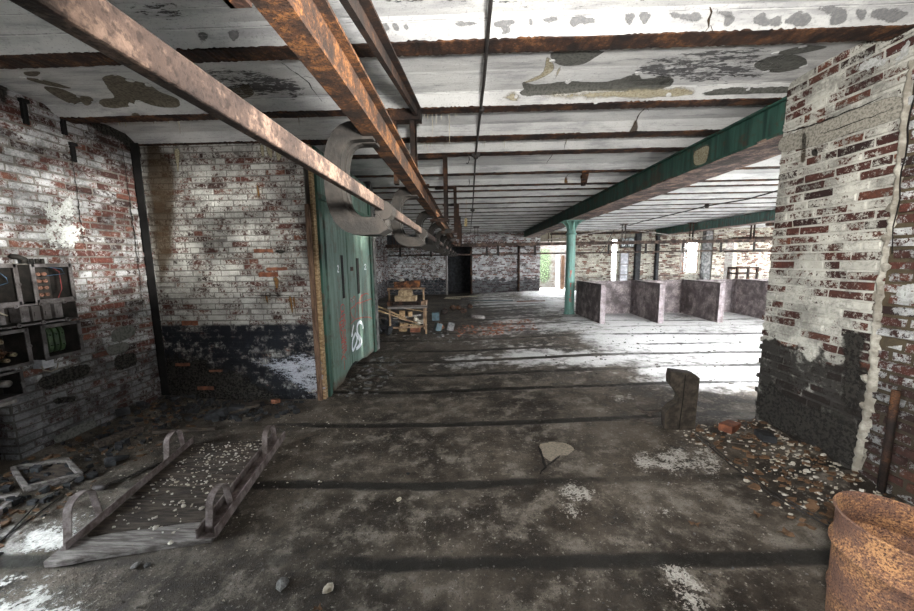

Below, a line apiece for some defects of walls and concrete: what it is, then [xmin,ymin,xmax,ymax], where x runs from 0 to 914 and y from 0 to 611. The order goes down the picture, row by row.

peeling [549,50,606,66]
peeling [19,71,180,116]
peeling [227,81,254,99]
peeling [514,71,674,106]
peeling [703,86,789,96]
water stain [146,146,180,277]